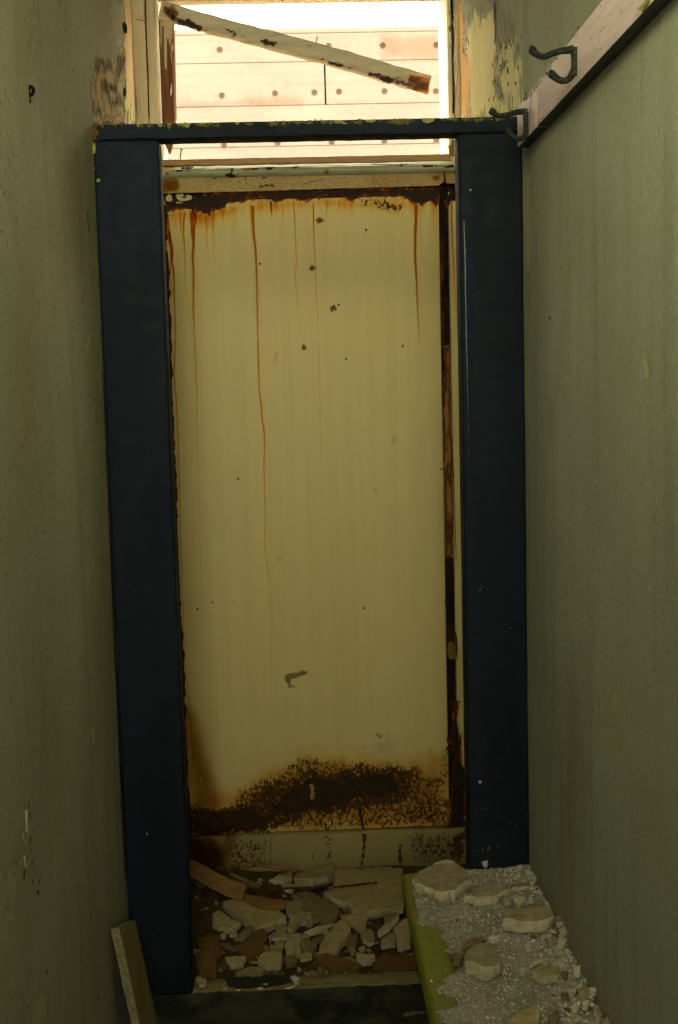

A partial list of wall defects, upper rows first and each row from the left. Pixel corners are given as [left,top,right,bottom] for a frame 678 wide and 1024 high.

peeling [91,0,558,129]
rust [163,187,455,567]
rust [179,585,465,866]